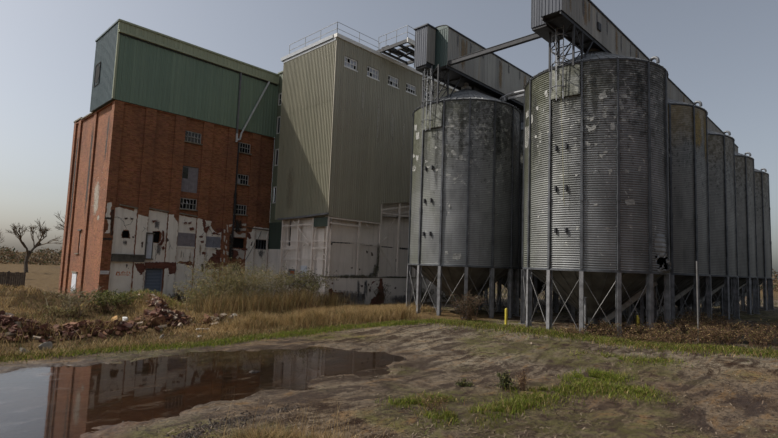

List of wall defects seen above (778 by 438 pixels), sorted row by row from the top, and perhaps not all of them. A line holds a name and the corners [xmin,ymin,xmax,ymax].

peeling [126,216,251,286]